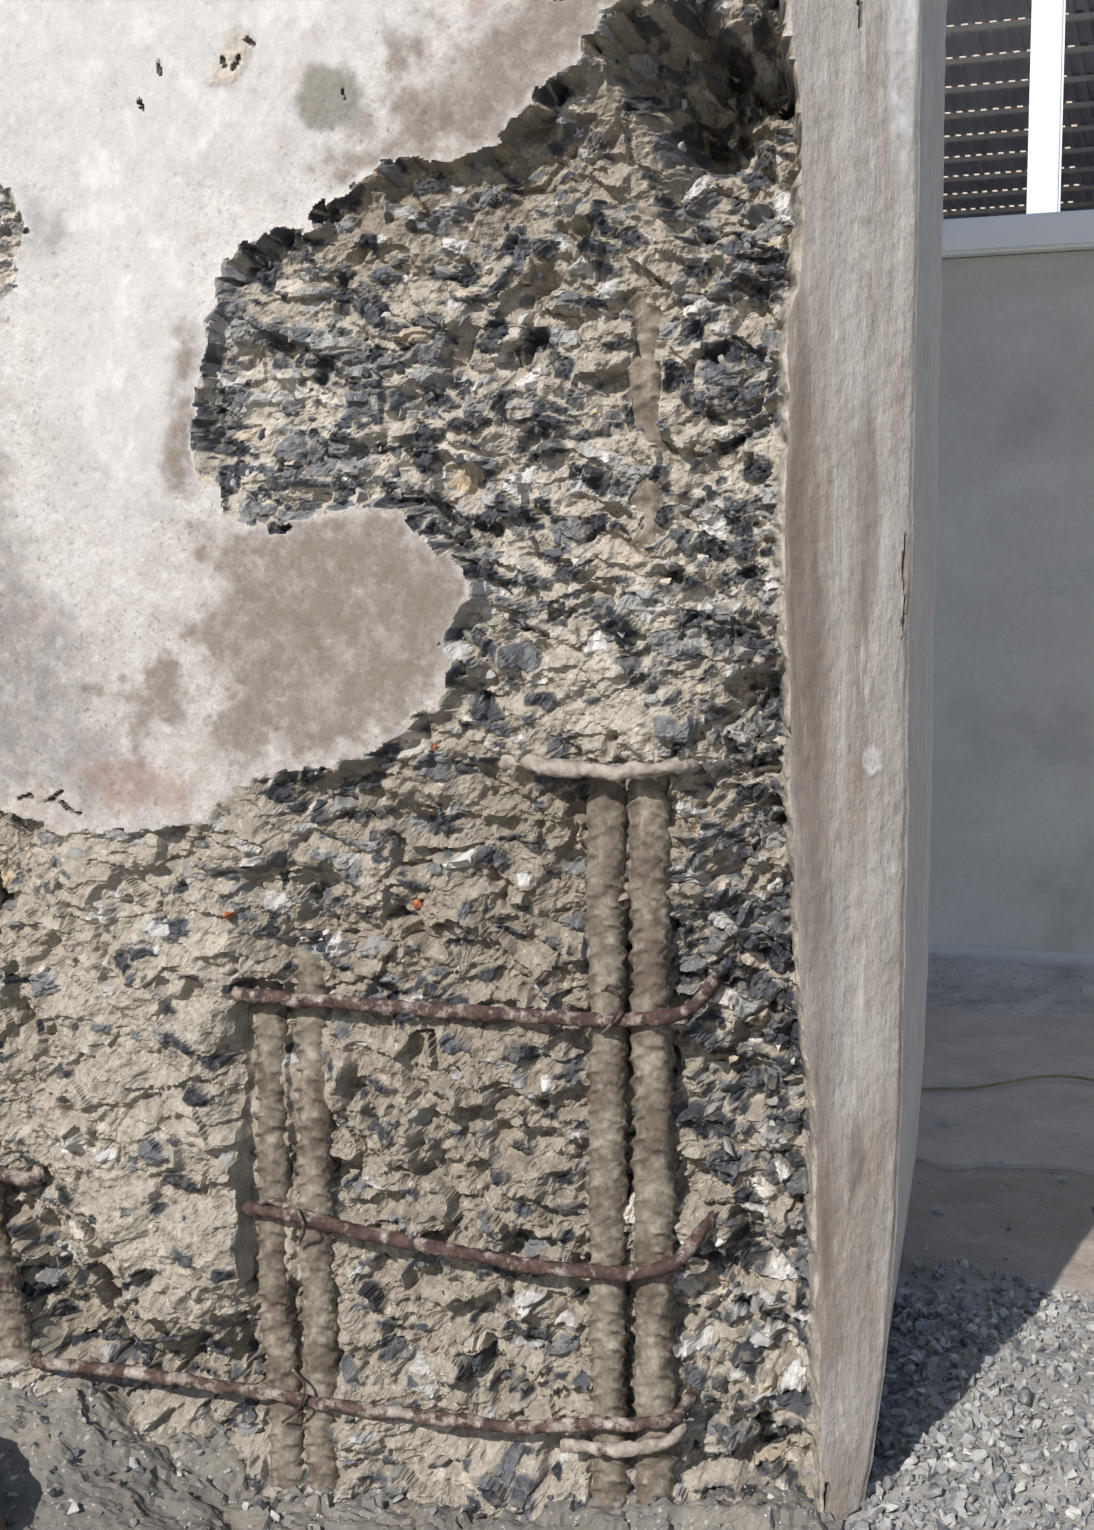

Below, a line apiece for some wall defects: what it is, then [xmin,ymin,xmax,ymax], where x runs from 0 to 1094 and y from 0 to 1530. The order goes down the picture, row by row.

water stain [0,0,367,500]
water stain [135,660,180,724]
water stain [189,518,461,752]
spalling [0,0,824,1522]